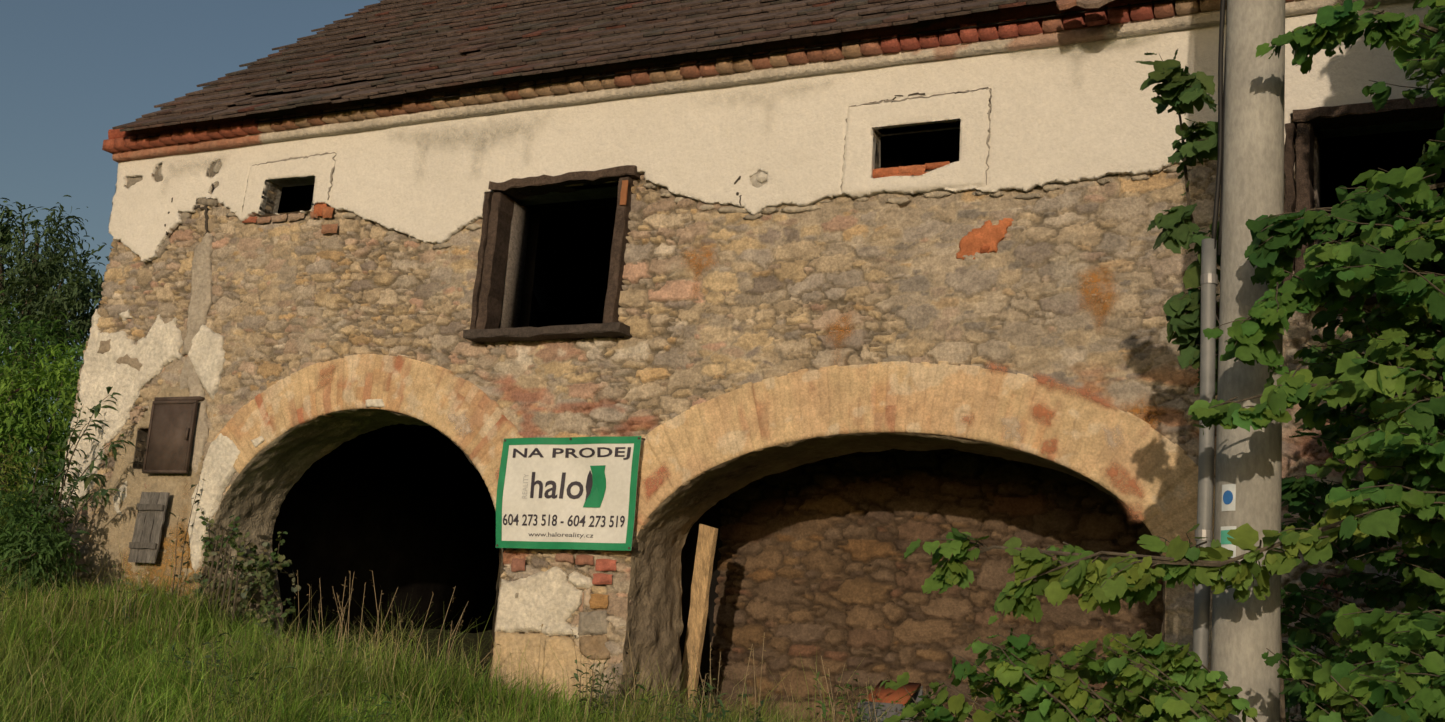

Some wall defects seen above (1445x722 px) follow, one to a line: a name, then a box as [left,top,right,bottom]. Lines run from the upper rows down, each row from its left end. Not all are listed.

spalling [750,171,767,188]
flaking render [180,160,253,224]
flaking render [643,182,685,203]
flaking render [972,184,1060,200]
flaking render [314,204,358,220]
flaking render [699,200,833,220]
flaking render [156,237,171,259]
flaking render [386,231,454,249]
flaking render [956,218,1014,260]
spalling [1035,375,1111,407]